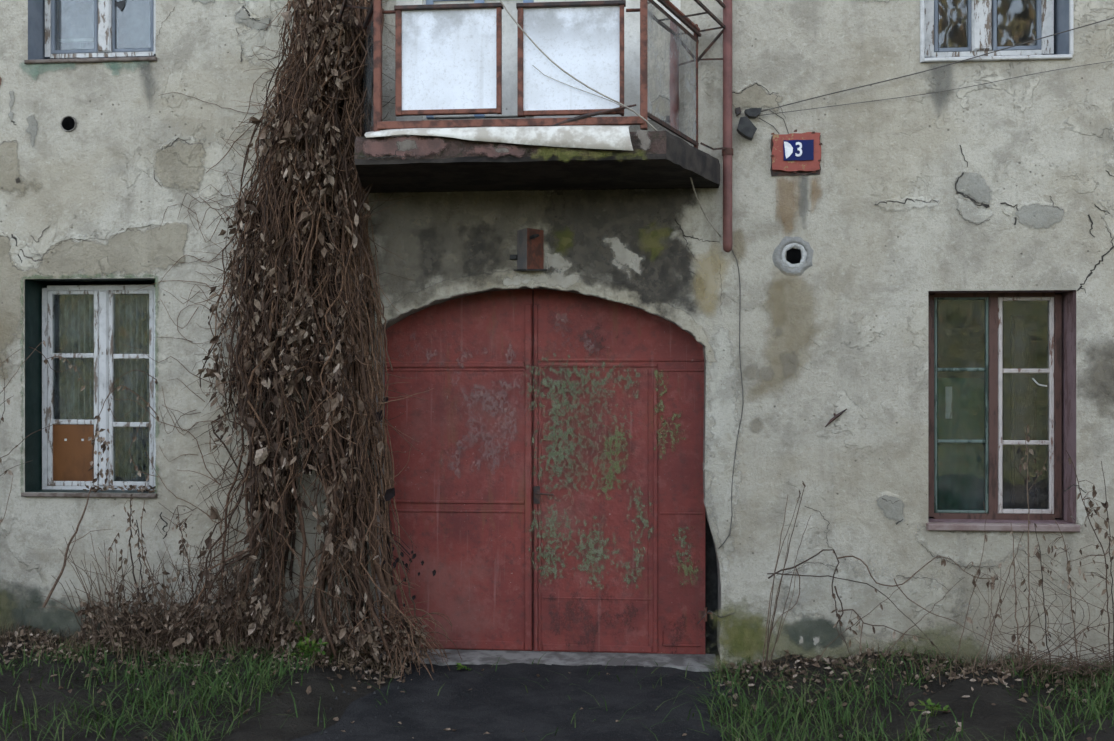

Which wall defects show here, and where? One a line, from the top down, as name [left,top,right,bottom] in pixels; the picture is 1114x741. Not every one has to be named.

spalling [0,77,42,196]
spalling [154,133,205,191]
peeling [0,220,188,378]
damp [371,190,579,312]
damp [605,238,701,302]
crack [1077,205,1114,293]